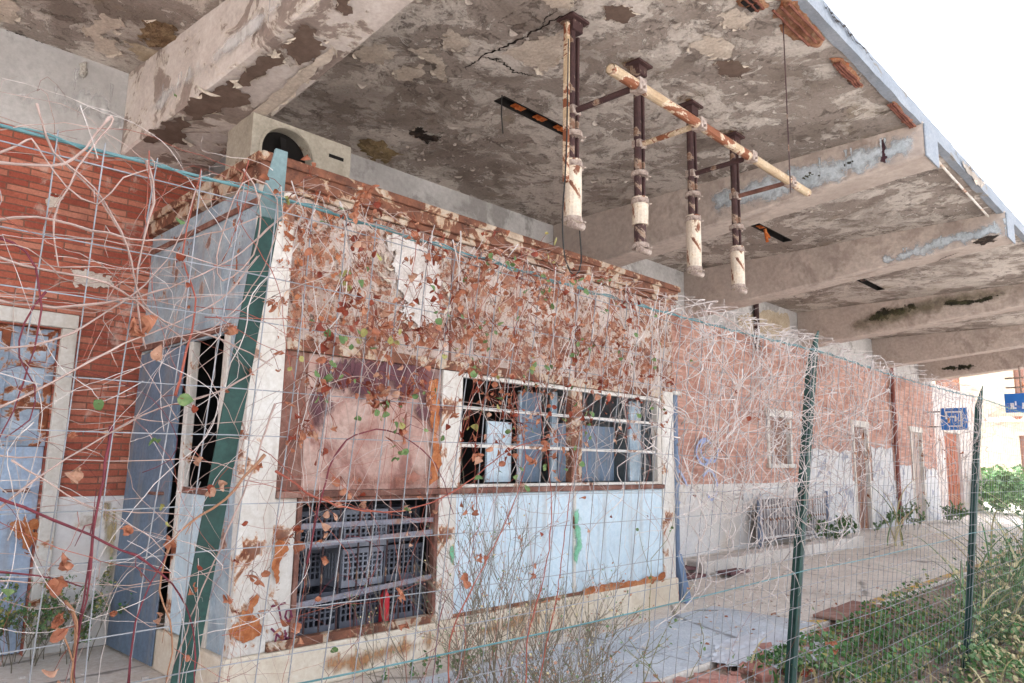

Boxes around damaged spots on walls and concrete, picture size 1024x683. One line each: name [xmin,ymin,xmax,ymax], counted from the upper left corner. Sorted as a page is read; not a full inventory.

peeling [0,0,30,25]
peeling [82,13,178,61]
crack [465,9,587,76]
spalling [603,0,825,131]
spalling [830,58,864,89]
peeling [143,19,564,187]
spalling [882,101,916,129]
damp [854,295,998,327]
rust [583,572,666,595]